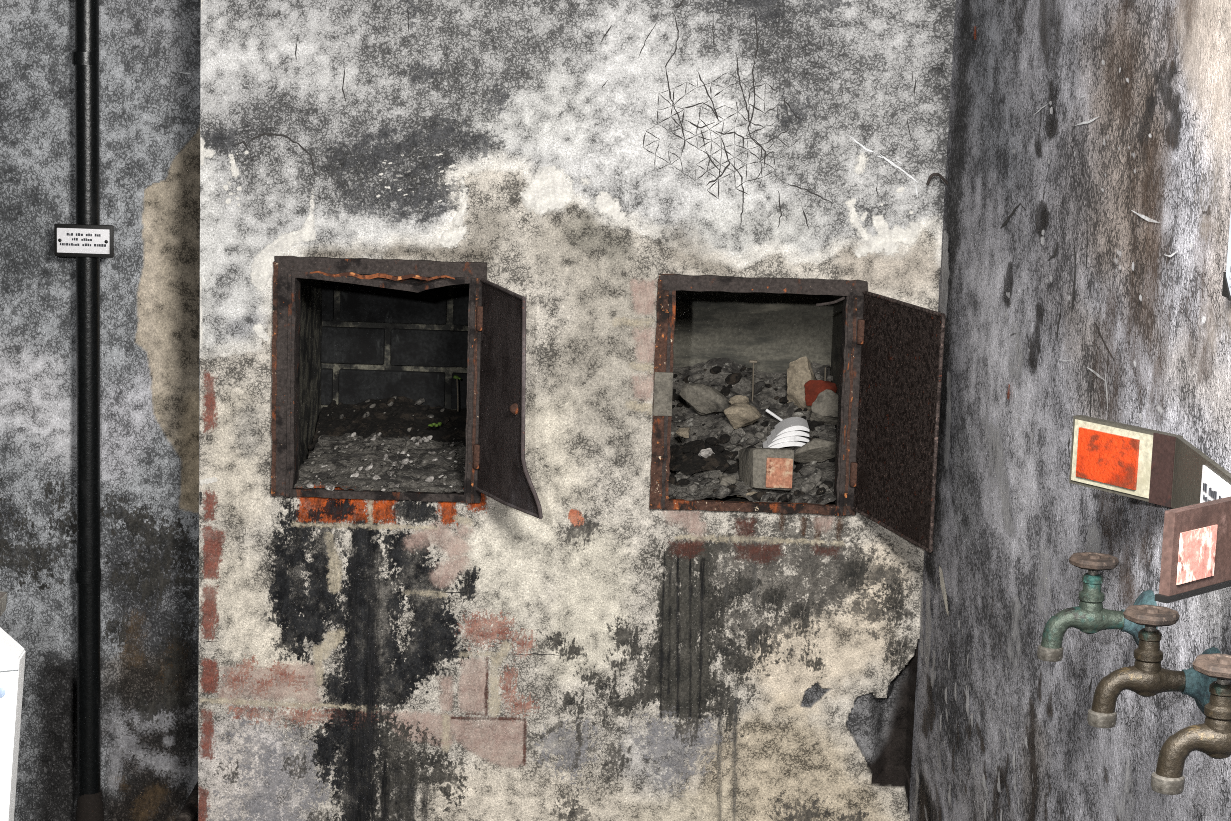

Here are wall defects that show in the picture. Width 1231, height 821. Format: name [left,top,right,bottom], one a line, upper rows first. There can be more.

crack [639,0,833,228]
crack [907,73,916,140]
flaking render [130,116,249,640]
flaking render [250,195,317,291]
rust [310,271,455,281]
damp [1003,261,1013,307]
rust [281,485,487,530]
damp [100,486,199,790]
damp [207,521,429,821]
flaking render [200,611,540,765]
damp [535,495,922,821]
spalling [842,566,1070,821]